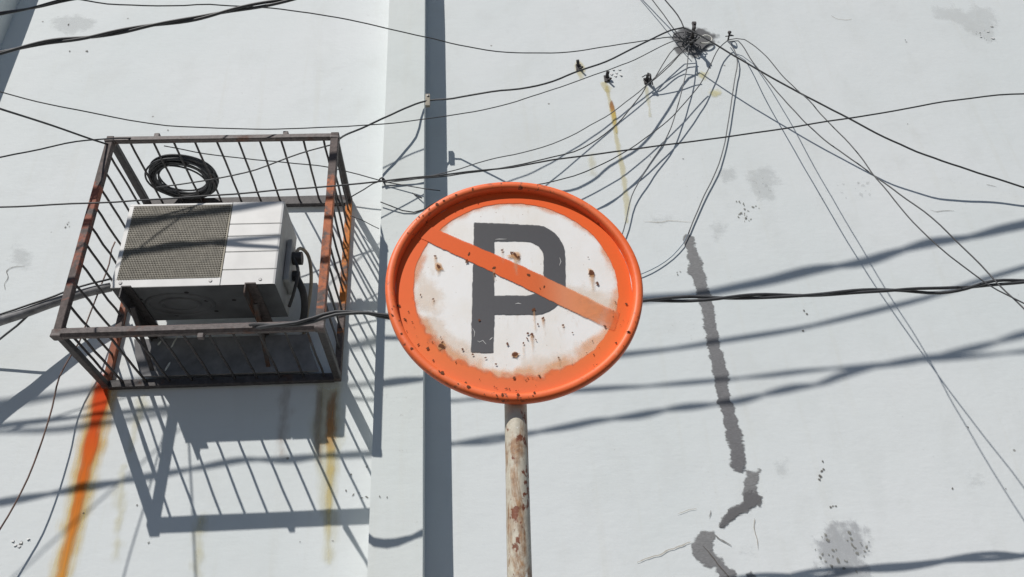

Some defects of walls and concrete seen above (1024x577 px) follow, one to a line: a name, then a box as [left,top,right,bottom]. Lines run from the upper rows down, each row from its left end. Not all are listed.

corrosion [58,375,111,577]
water stain [815,531,870,572]